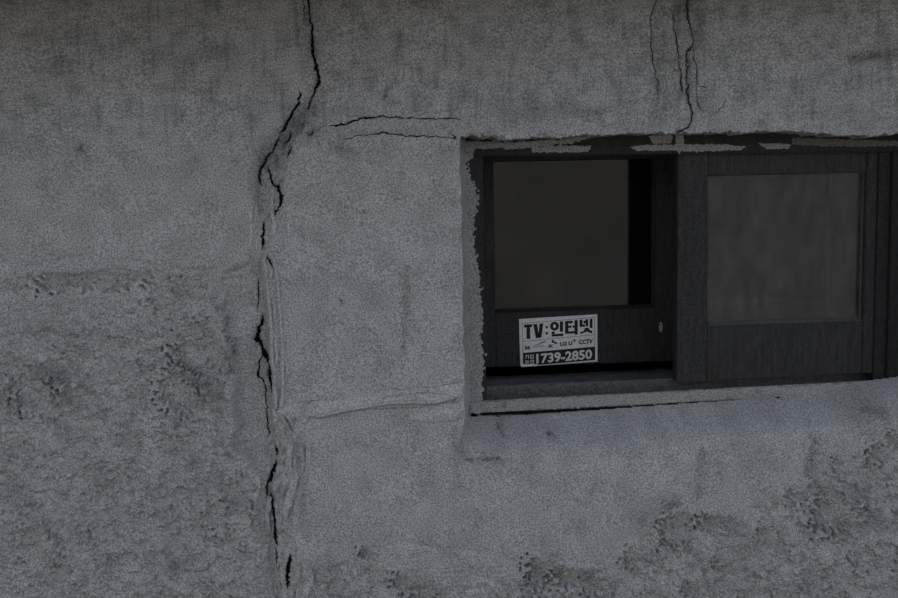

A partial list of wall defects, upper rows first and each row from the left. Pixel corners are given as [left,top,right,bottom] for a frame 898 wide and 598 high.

crack [253,0,461,589]
crack [650,0,727,133]